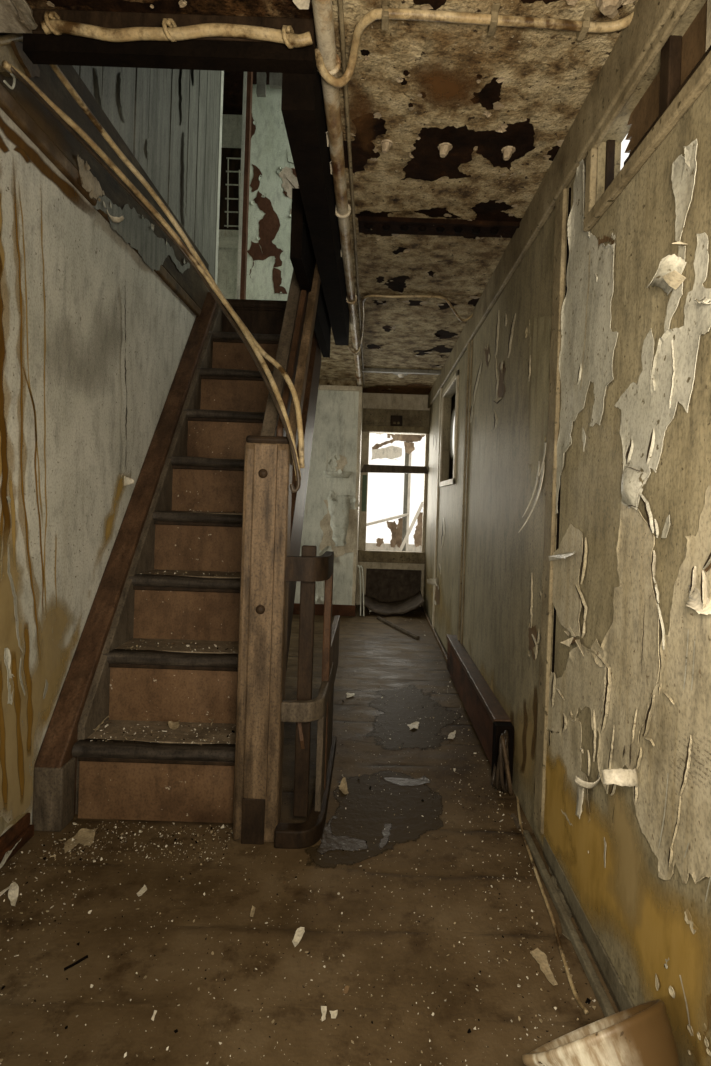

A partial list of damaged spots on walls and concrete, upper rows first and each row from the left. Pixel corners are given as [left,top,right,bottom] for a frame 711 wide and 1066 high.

spalling [413,0,446,10]
rust [0,116,87,209]
peeling [77,155,190,273]
peeling [247,157,299,295]
spalling [343,113,387,175]
spalling [355,200,522,255]
spalling [401,74,564,181]
spalling [376,275,480,310]
spalling [413,329,458,367]
rust [0,186,57,655]
peeling [527,139,711,902]
damp [481,669,708,1066]